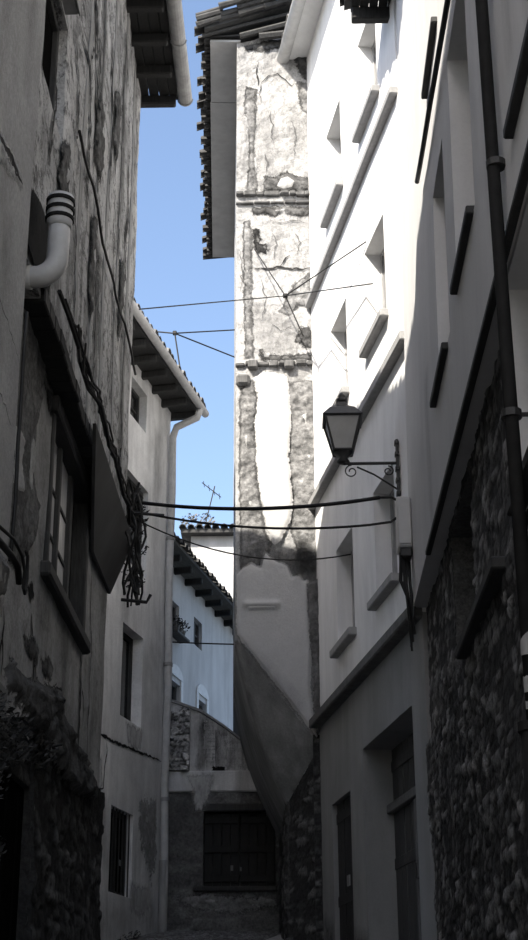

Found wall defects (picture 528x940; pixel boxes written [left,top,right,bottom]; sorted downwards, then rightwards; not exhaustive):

crack [0,134,23,185]
spalling [244,39,281,53]
spalling [243,86,309,192]
crack [256,62,297,172]
spalling [294,57,307,113]
spalling [242,204,312,362]
flaking render [238,379,273,569]
flaking render [288,380,320,713]